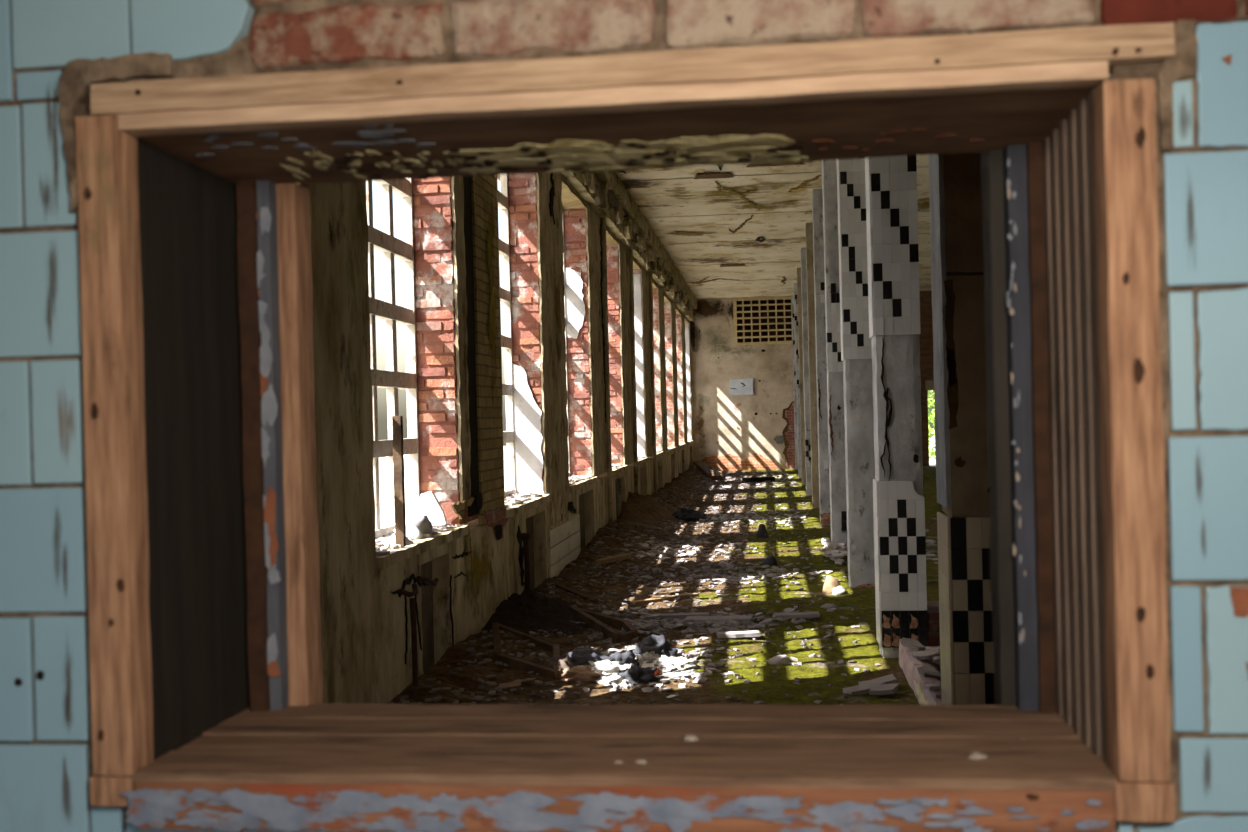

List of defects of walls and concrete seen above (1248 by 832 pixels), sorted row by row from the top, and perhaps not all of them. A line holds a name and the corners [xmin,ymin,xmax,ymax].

flaking render [249,0,1248,69]
water stain [621,181,659,189]
peeling [195,124,809,320]
water stain [690,241,782,263]
peeling [119,788,1111,832]